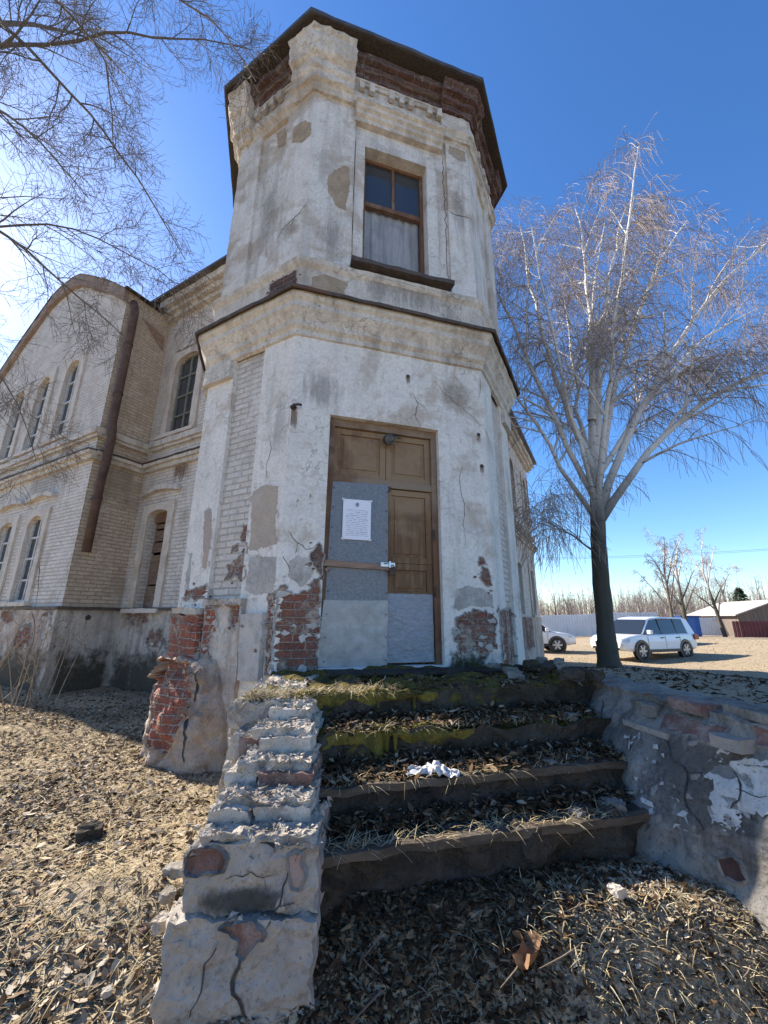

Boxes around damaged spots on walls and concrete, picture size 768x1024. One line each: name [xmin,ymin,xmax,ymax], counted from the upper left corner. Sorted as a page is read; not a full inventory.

crack [441,152,468,278]
flaking render [123,507,243,759]
peeling [224,483,279,588]
flaking render [254,542,330,677]
flaking render [473,556,493,594]
flaking render [451,607,535,666]
crack [182,671,199,762]
peeling [634,777,654,815]
crack [666,740,707,830]
peeling [658,710,768,833]
crack [189,948,245,1019]